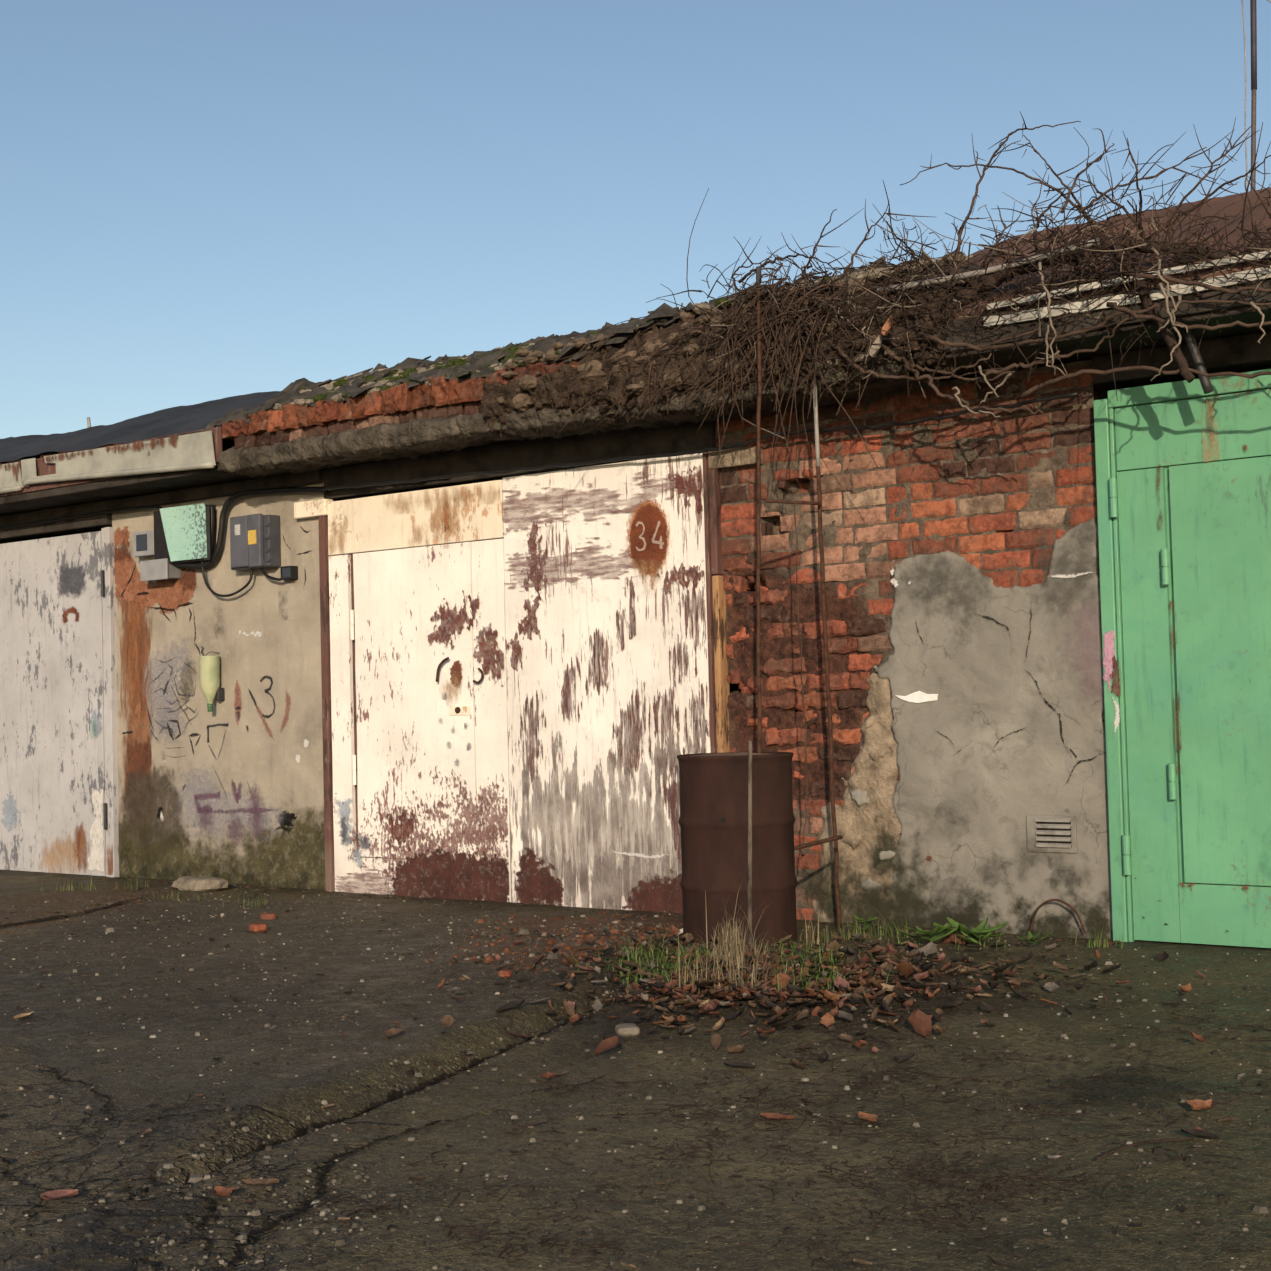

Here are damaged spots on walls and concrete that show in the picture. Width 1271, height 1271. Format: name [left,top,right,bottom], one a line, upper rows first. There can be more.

corrosion [0,462,21,480]
corrosion [40,434,178,462]
corrosion [627,499,669,585]
spalling [761,522,788,536]
corrosion [120,598,155,796]
corrosion [446,660,462,697]
crack [975,609,1105,786]
damp [118,768,326,890]